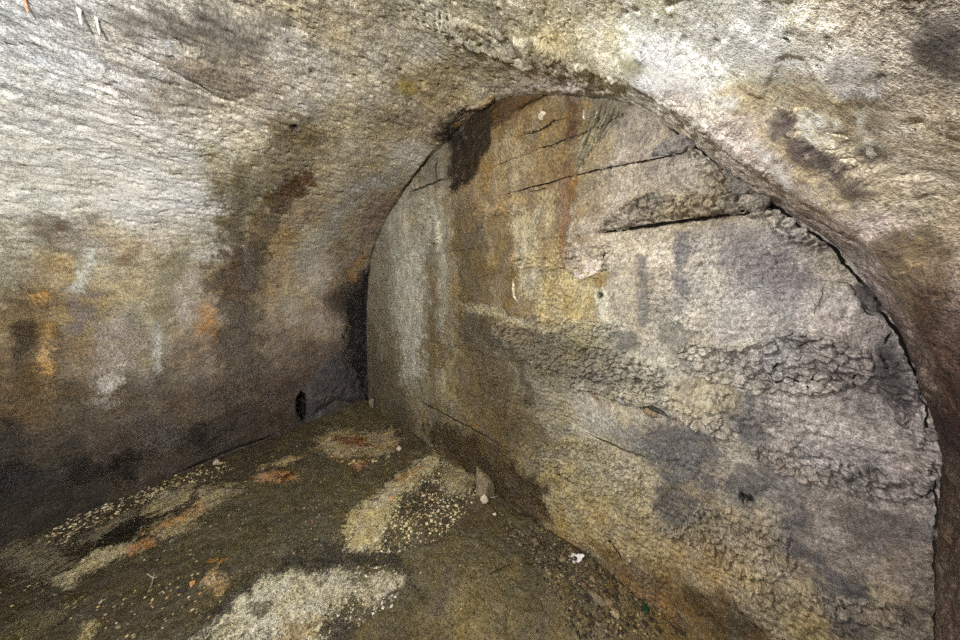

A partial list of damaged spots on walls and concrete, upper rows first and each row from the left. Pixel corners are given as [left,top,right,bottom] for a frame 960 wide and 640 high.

water stain [447,94,540,194]
crack [485,95,545,126]
crack [496,117,618,166]
crack [500,123,724,196]
water stain [64,246,103,332]
water stain [147,112,329,408]
corrosion [442,94,608,338]
crack [601,193,933,444]
water stain [188,168,566,640]